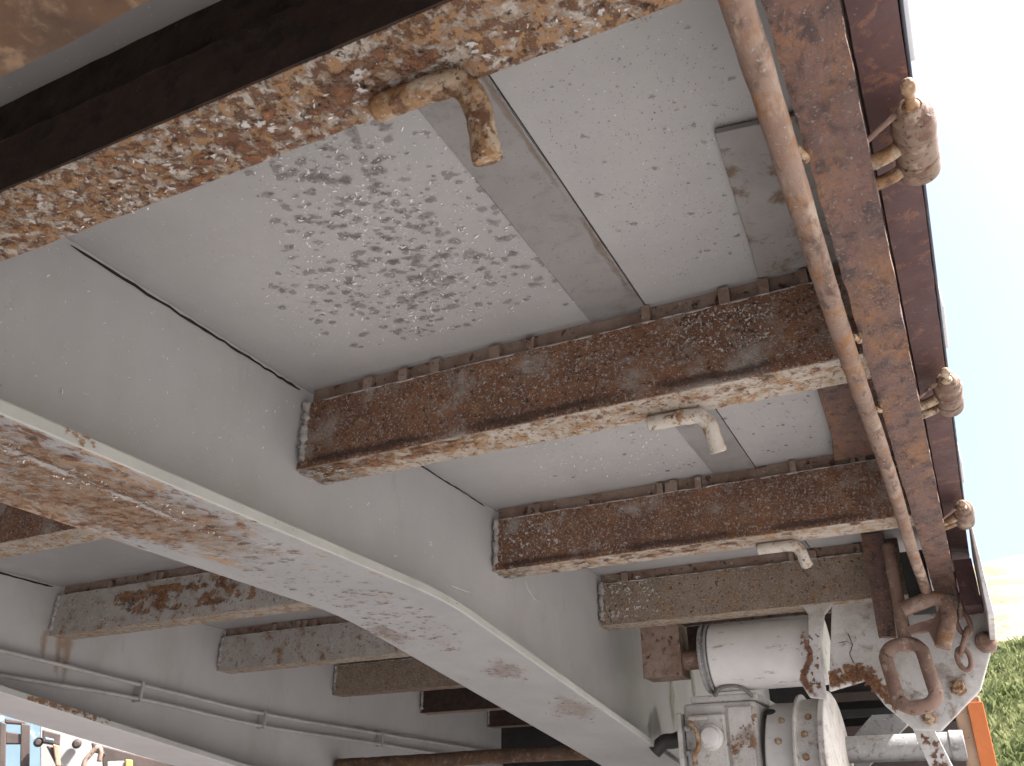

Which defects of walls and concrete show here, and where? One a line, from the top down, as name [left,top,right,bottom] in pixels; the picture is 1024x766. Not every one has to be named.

rust [0,47,441,249]
crack [71,245,300,390]
rust [307,363,821,477]
rust [0,428,455,651]
rust [504,534,745,572]
rust [772,515,860,536]
rust [800,632,898,710]